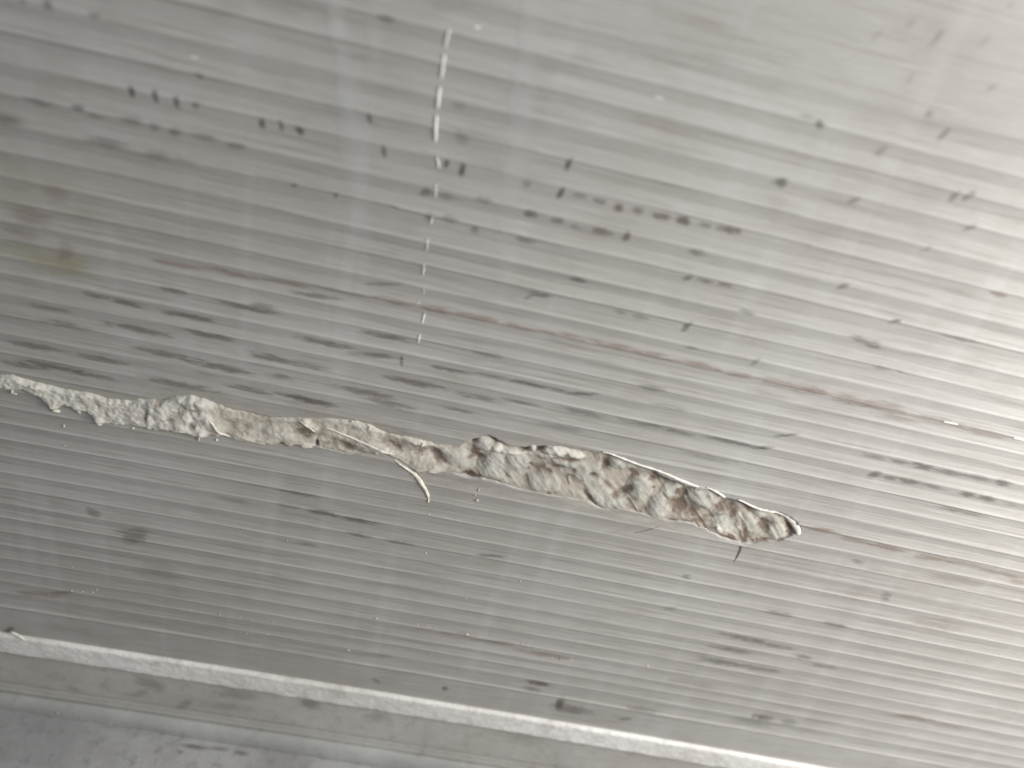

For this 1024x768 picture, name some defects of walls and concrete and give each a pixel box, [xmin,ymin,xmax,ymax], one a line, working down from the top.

spalling [0,374,801,562]